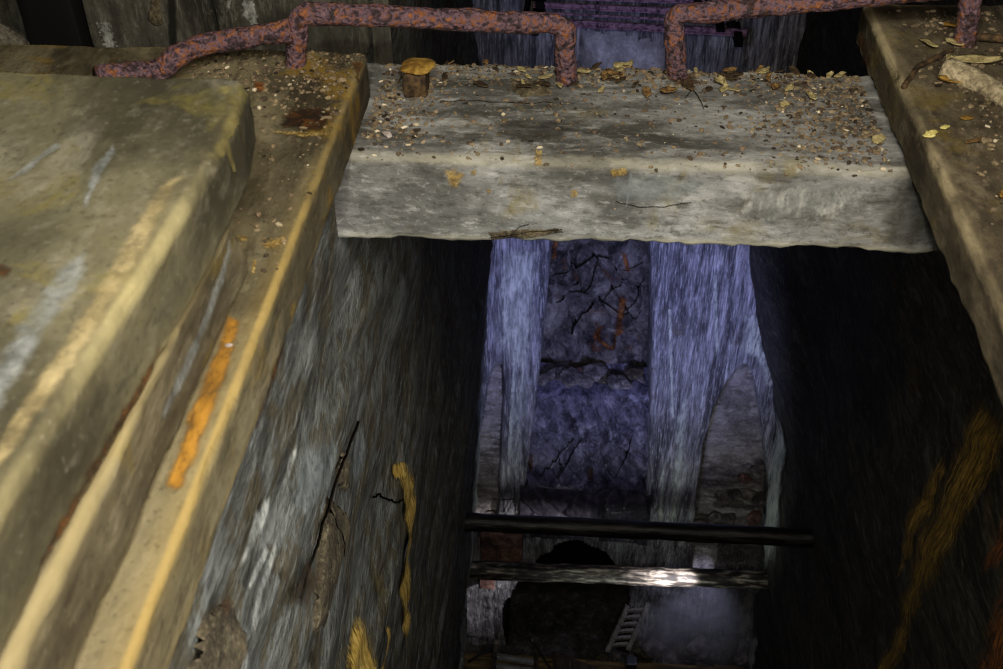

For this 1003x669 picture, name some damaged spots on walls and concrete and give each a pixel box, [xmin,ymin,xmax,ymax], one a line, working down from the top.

rust [92,1,578,87]
rust [664,0,939,84]
rust [954,0,982,48]
crack [553,253,645,335]
crack [299,421,360,599]
crack [372,493,404,504]
water stain [348,462,417,669]